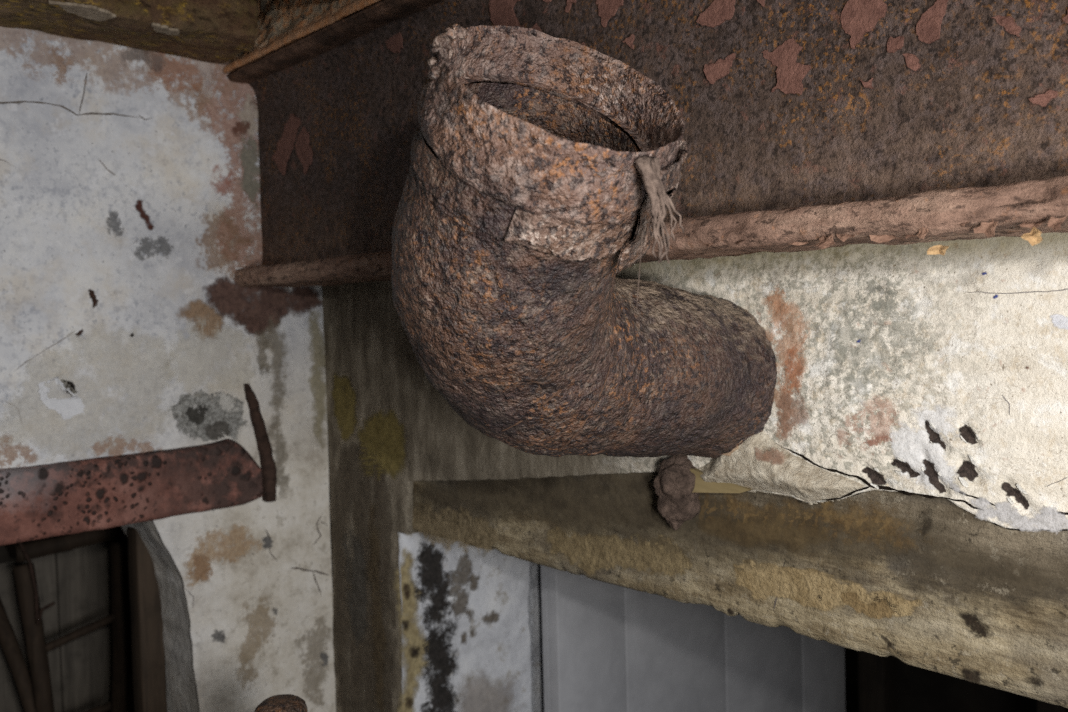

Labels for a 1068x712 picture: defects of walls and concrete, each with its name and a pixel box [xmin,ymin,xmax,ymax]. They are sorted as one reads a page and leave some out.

crack [0,74,150,120]
rust [420,23,469,114]
leakage [196,212,251,277]
leakage [180,300,223,337]
rust [0,437,35,466]
rust [93,438,154,456]
crack [776,443,1068,531]
peeling [862,406,1068,532]
leakage [412,543,513,712]